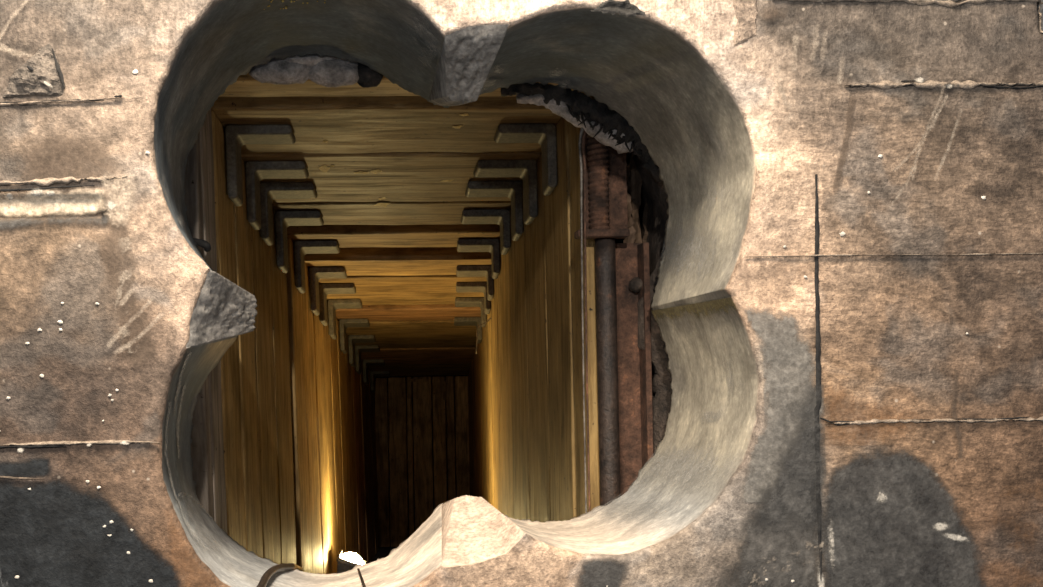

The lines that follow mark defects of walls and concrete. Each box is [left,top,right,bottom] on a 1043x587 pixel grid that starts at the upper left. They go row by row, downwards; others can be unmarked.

spalling [3,43,66,98]
crack [0,95,122,103]
spalling [429,24,509,106]
crack [985,83,1043,91]
spalling [186,270,257,348]
crack [814,174,866,581]
crack [0,442,67,450]